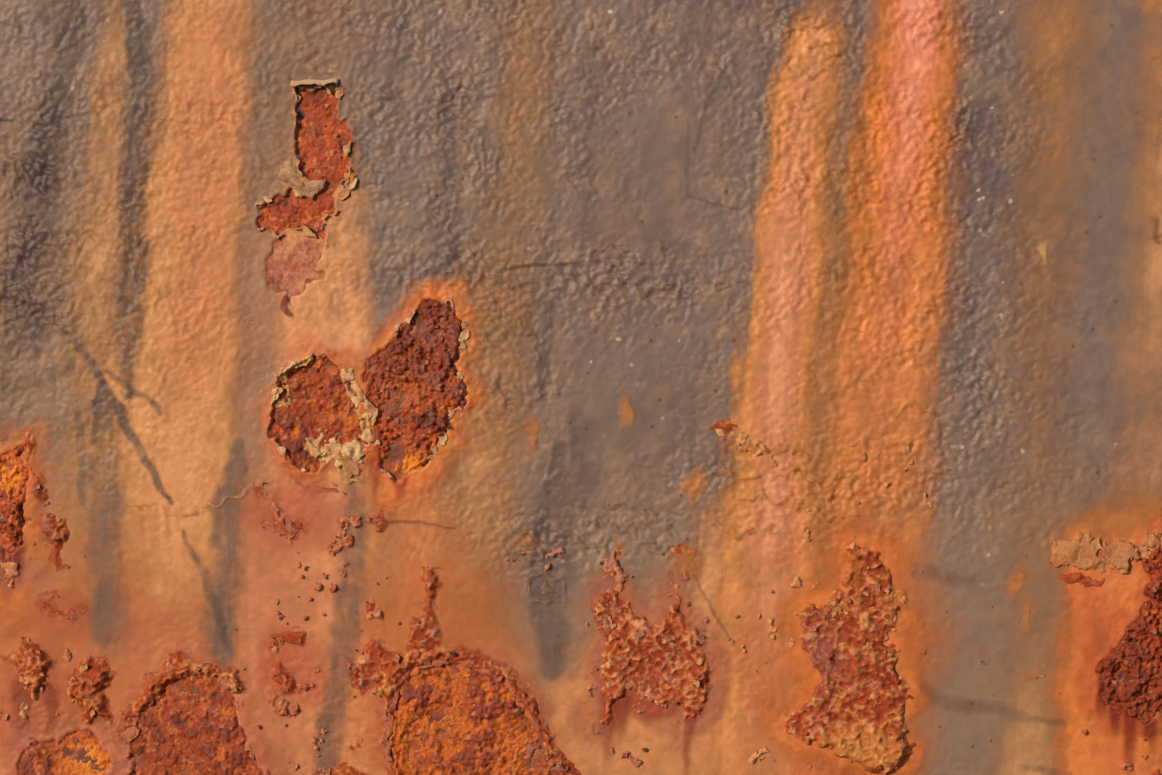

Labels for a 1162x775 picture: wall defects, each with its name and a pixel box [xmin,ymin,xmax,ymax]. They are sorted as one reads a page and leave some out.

leakage [6,0,83,337]
peeling [255,78,357,316]
leakage [86,239,171,503]
corrosion [0,0,372,775]
peeling [264,281,482,511]
corrosion [312,0,958,775]
corrosion [1019,121,1162,775]